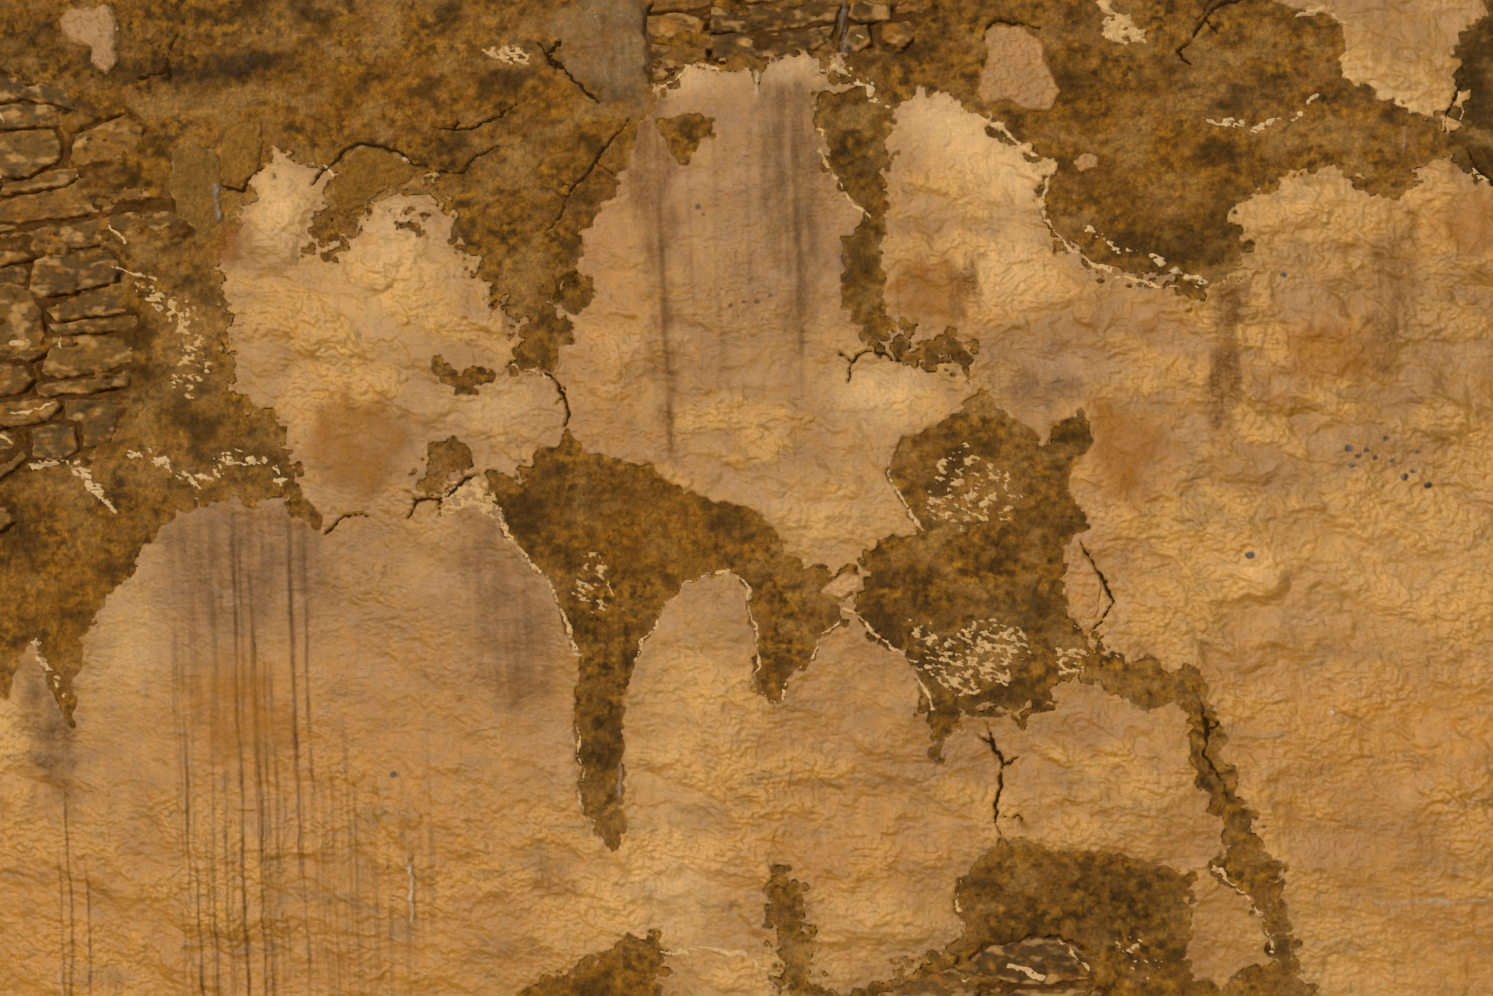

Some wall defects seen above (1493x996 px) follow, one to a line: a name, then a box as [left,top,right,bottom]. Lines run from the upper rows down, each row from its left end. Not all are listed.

crack [1176,0,1243,65]
flaking render [0,0,1493,729]
leakage [31,638,66,698]
flaking render [485,390,1318,996]
crack [978,723,1024,845]